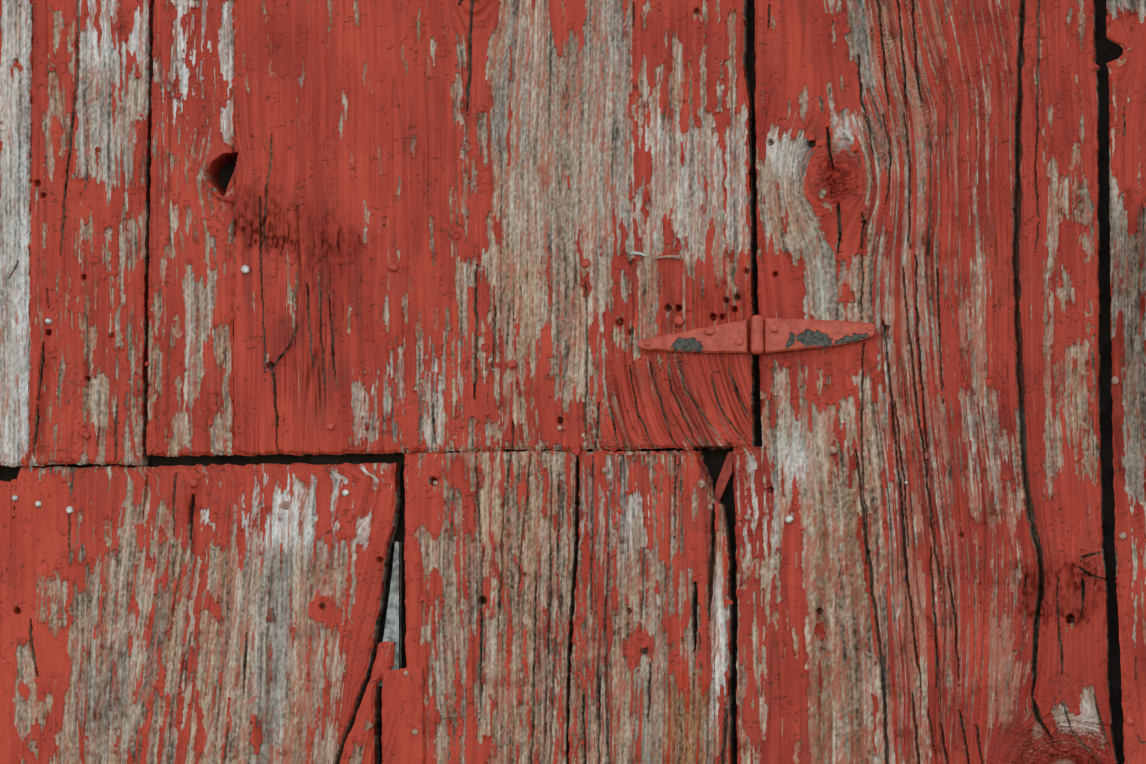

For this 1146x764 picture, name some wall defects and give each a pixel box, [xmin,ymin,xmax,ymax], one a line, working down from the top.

peeling [214,0,236,145]
peeling [1106,0,1146,23]
peeling [0,0,208,467]
peeling [79,194,233,462]
crack [259,134,338,452]
peeling [349,0,1029,764]
crack [1012,0,1110,752]
peeling [1042,126,1099,502]
peeling [1109,162,1146,578]
peeling [13,464,372,764]
peeling [1049,696,1102,754]